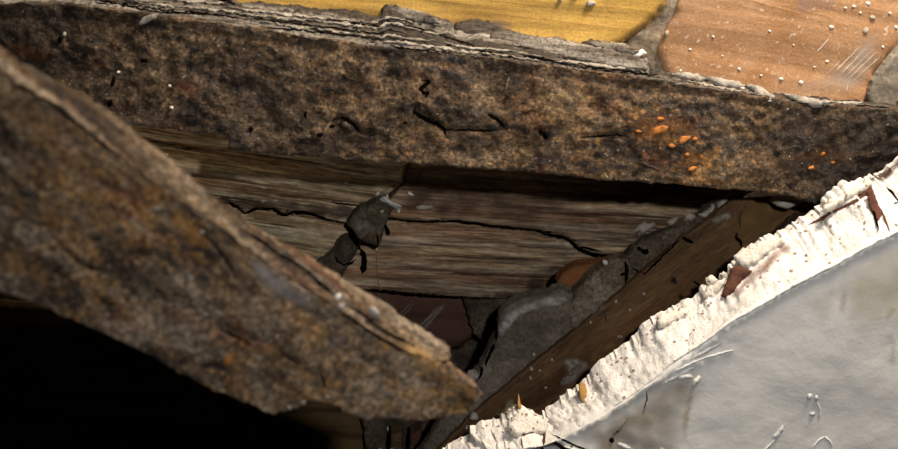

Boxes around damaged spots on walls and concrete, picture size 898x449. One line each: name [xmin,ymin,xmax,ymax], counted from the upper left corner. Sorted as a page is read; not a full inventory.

peeling [138,13,159,25]
crack [332,116,359,132]
crack [413,79,504,137]
crack [583,132,627,140]
corrosion [635,117,668,135]
corrosion [668,136,703,171]
crack [196,225,238,280]
crack [218,200,693,380]
spalling [442,156,898,449]
crack [281,352,327,389]